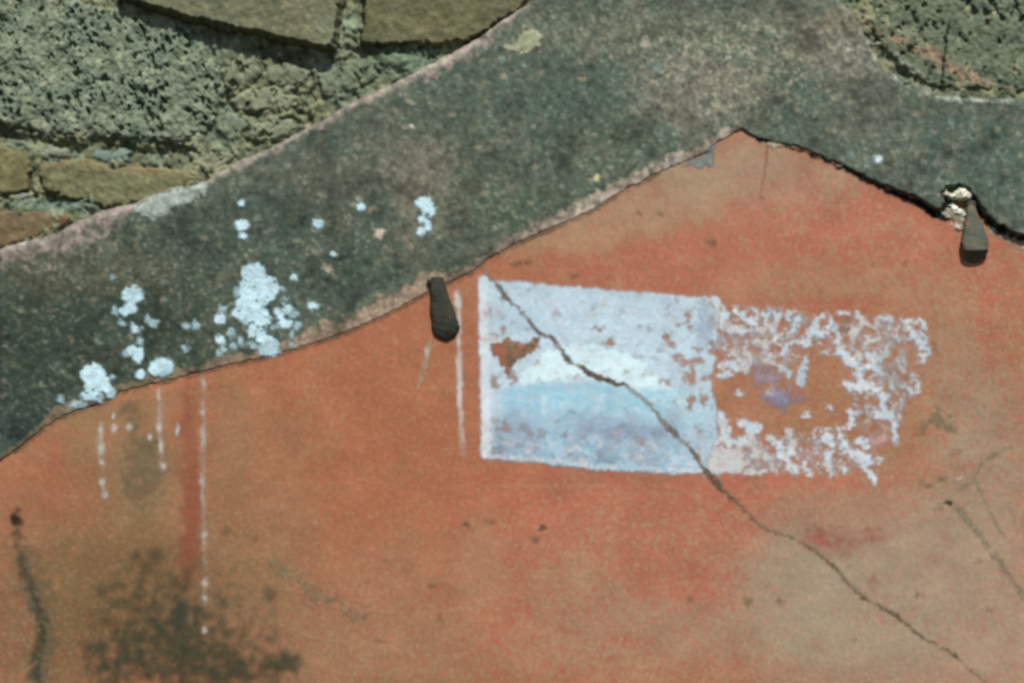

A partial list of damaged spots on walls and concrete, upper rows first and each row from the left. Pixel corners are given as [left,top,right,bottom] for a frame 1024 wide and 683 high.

damp [98,414,132,465]
damp [127,389,166,496]
peeling [492,339,538,374]
crack [480,266,936,644]
peeling [703,296,931,485]
damp [86,580,297,683]